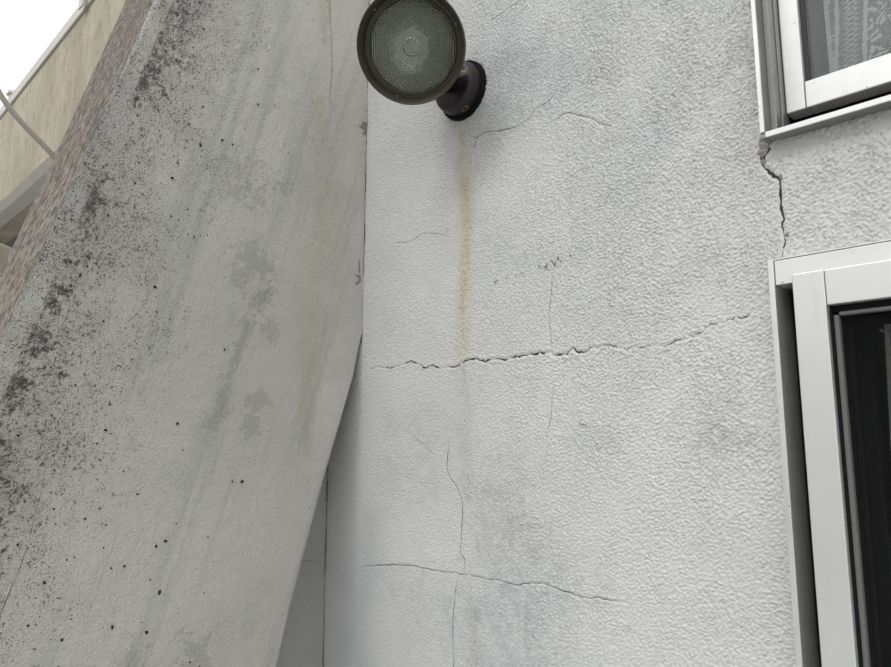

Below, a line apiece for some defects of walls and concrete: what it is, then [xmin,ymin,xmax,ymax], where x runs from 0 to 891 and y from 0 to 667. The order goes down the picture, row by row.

mould [127,0,205,130]
mould [71,166,120,244]
crack [760,147,786,257]
crack [372,288,752,369]
mould [0,254,100,559]
crack [364,440,625,667]